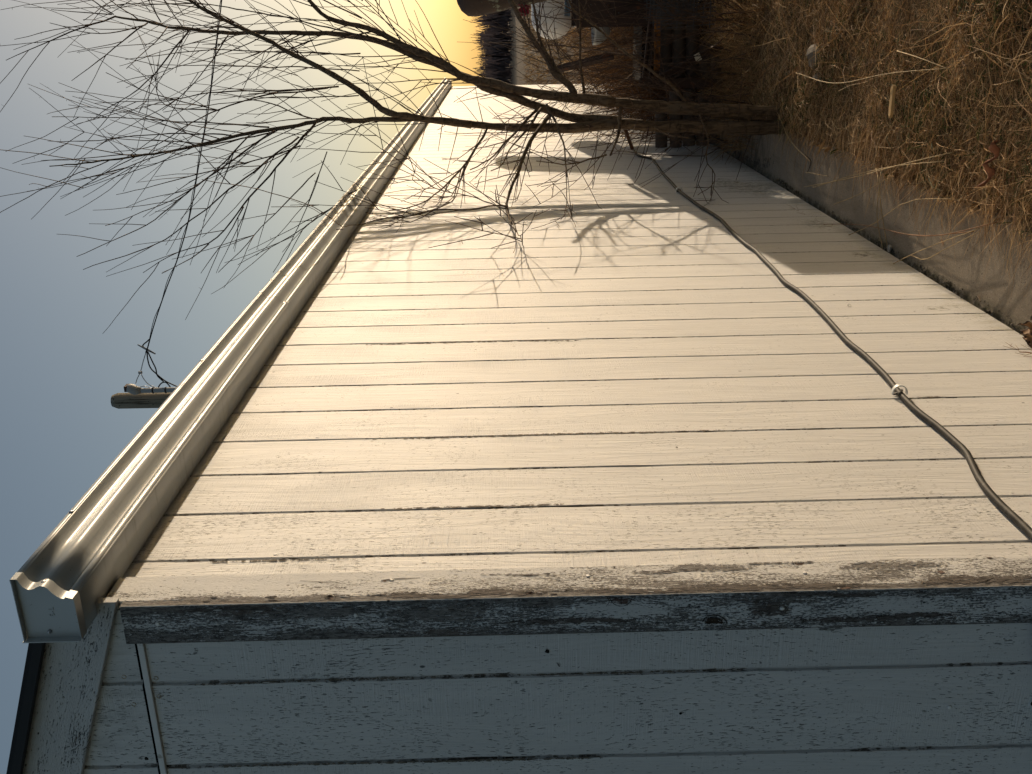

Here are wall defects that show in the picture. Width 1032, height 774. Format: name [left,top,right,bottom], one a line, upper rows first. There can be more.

peeling [153,561,1032,632]